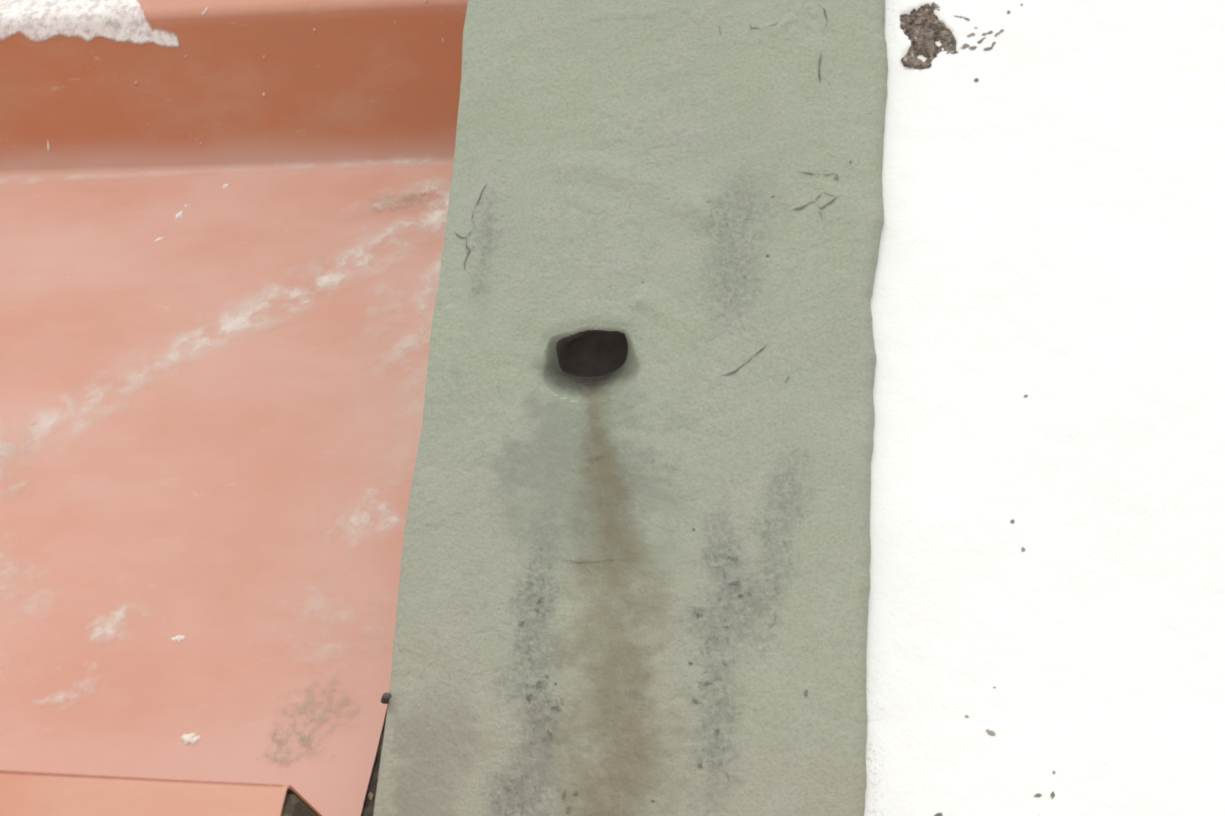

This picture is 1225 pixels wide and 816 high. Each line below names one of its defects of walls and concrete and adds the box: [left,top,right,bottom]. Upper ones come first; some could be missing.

leakage [560,374,615,389]